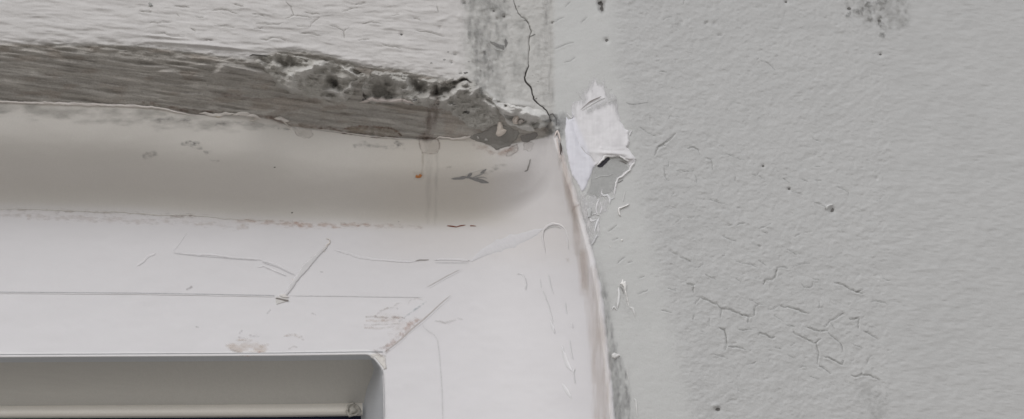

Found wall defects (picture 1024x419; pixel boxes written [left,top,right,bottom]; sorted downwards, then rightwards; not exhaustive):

spalling [250,39,562,158]
crack [513,0,587,125]
crack [609,115,890,380]